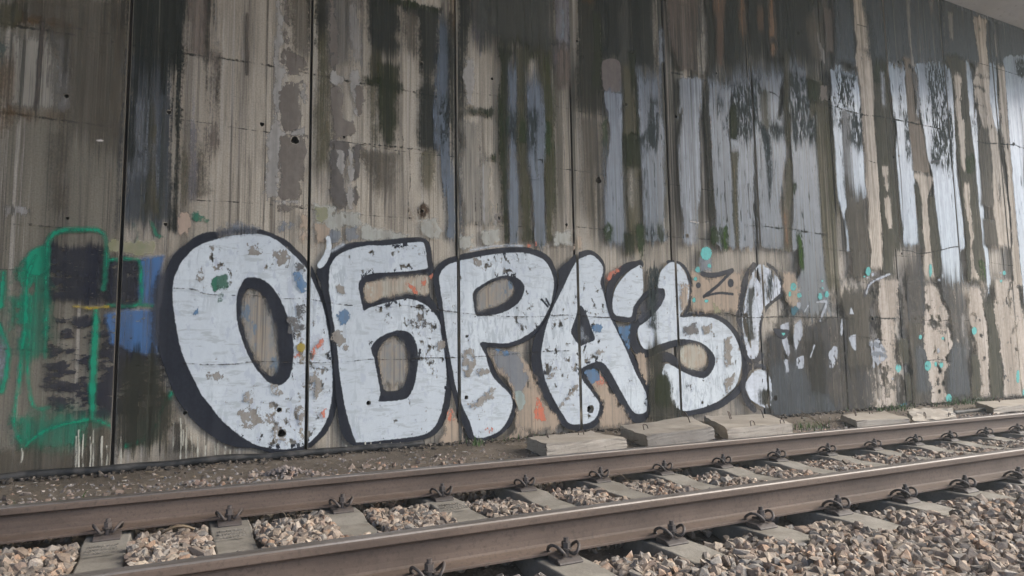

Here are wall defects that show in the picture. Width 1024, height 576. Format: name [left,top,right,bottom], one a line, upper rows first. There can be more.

peeling [196,267,229,302]
peeling [247,243,350,418]
peeling [237,390,285,443]